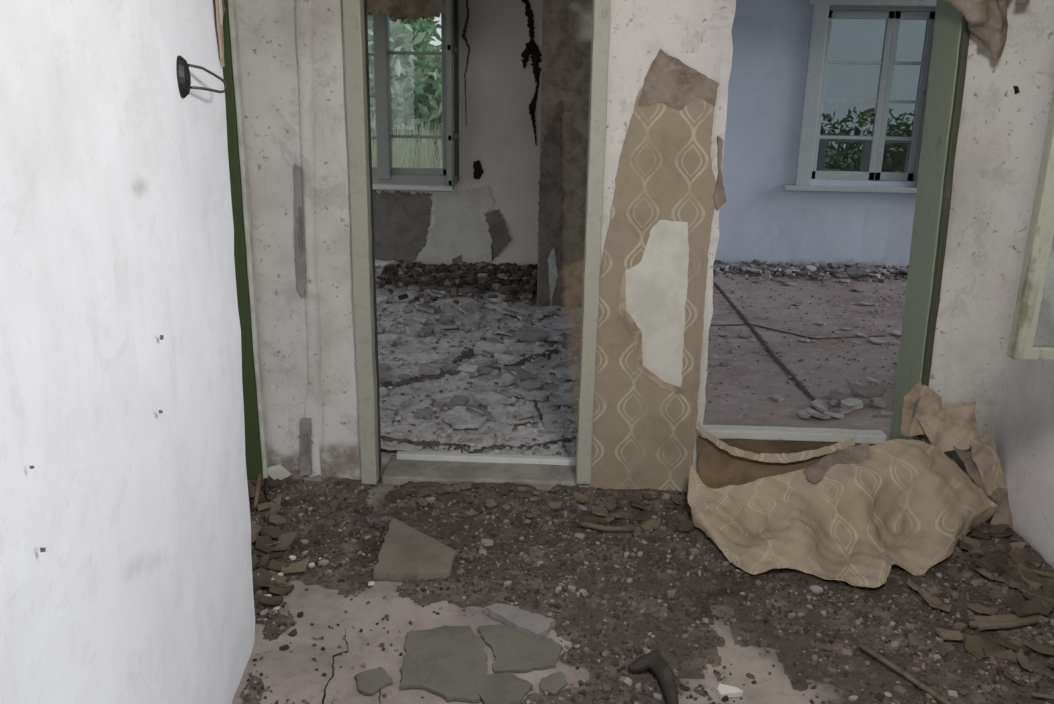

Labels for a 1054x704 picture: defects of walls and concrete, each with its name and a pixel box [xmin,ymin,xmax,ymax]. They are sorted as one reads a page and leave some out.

spalling [215,0,225,67]
crack [521,0,542,146]
peeling [373,160,510,265]
peeling [618,220,689,395]
crack [322,630,348,704]